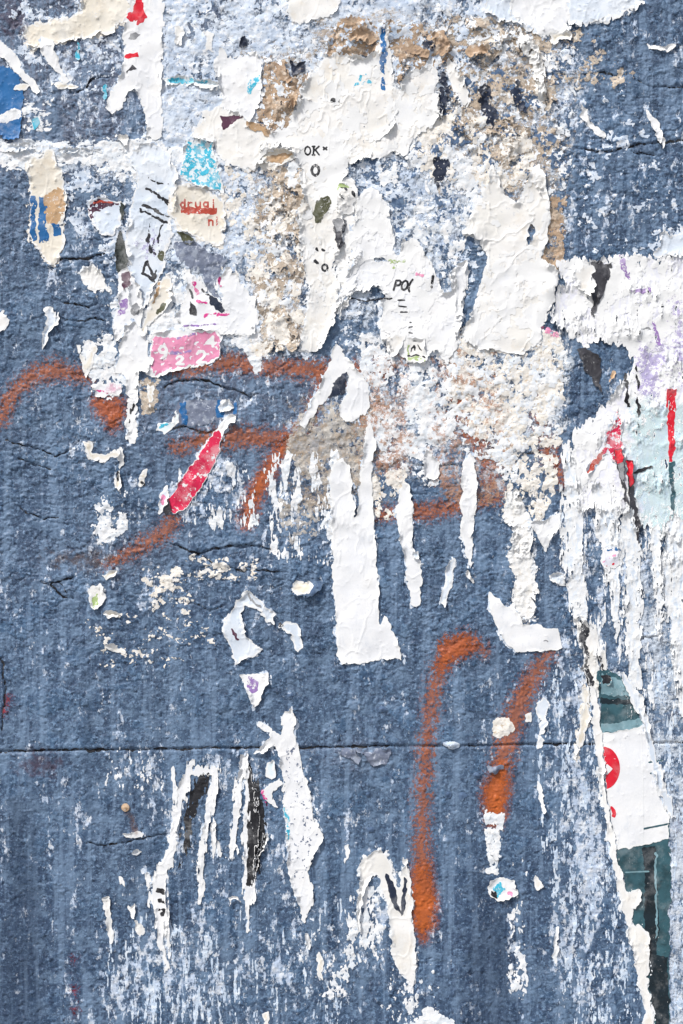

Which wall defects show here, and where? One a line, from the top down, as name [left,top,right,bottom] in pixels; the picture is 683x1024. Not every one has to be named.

peeling [0,0,682,375]
peeling [78,287,683,1024]